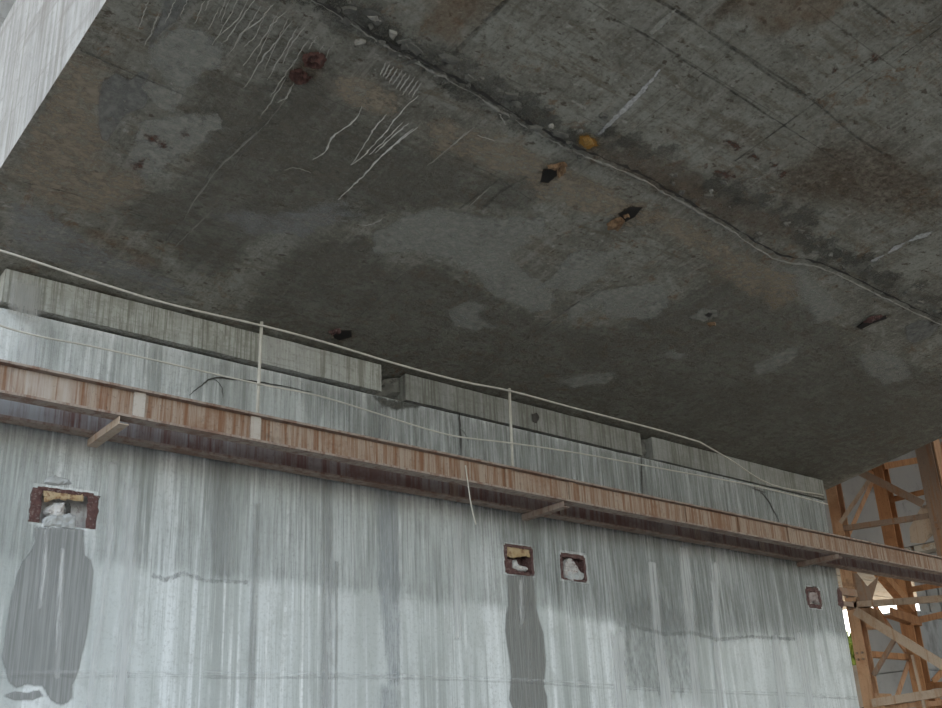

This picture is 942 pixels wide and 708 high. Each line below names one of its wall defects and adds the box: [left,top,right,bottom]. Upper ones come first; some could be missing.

water stain [165,0,333,249]
corrosion [289,52,327,85]
water stain [338,62,422,200]
spalling [540,162,567,183]
spalling [606,206,642,231]
crack [315,0,942,320]
water stain [3,527,104,704]
water stain [505,575,547,708]